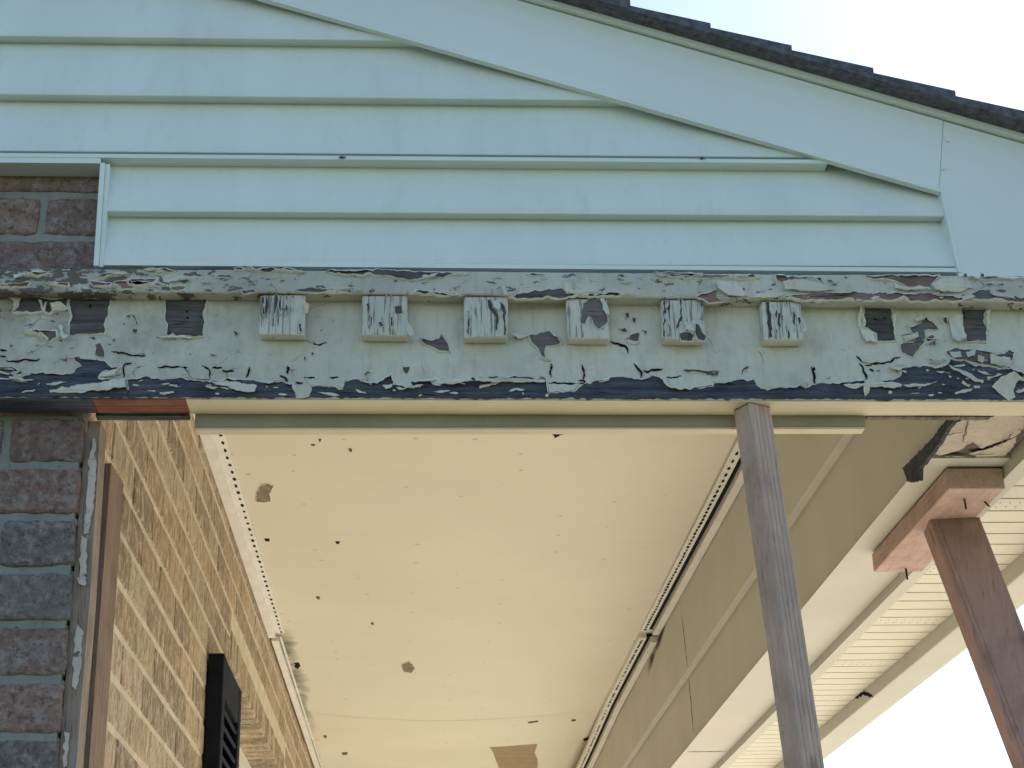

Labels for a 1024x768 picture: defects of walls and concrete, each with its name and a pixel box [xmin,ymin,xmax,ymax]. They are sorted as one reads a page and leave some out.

peeling [0,270,70,342]
peeling [87,266,304,292]
peeling [240,268,469,354]
peeling [486,272,647,362]
peeling [653,271,1024,401]
peeling [0,368,181,395]
peeling [205,379,287,396]
peeling [356,366,549,397]
peeling [76,413,97,586]
peeling [255,483,275,503]
peeling [72,624,83,689]
peeling [489,744,538,768]